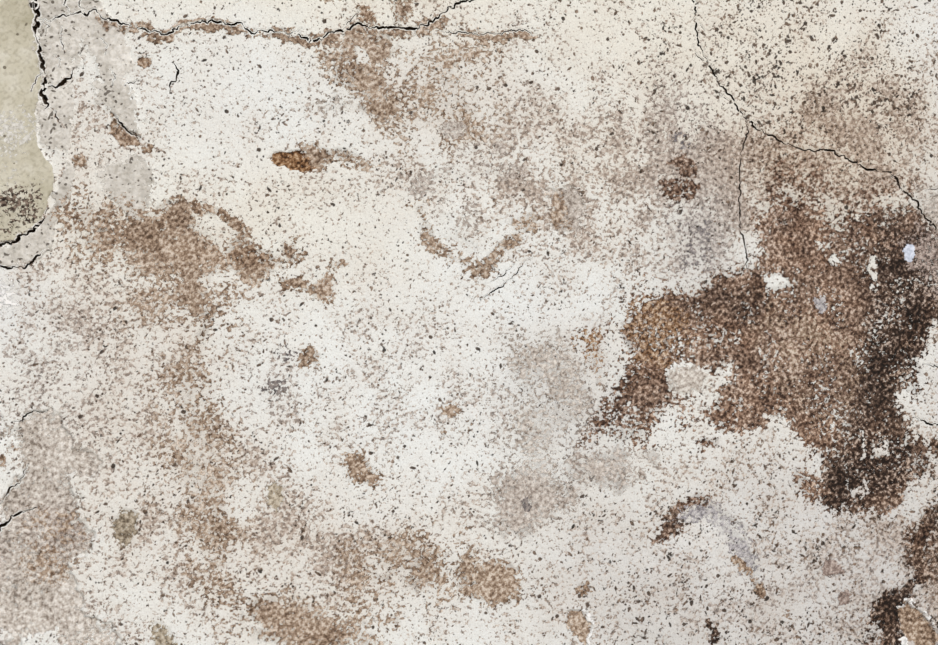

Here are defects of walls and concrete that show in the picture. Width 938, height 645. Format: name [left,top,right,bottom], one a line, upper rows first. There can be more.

crack [42,0,540,93]
crack [50,107,65,128]
crack [113,116,141,139]
crack [691,0,938,271]
spalling [0,183,43,242]
leakage [912,180,938,229]
spalling [0,412,19,467]
crack [0,410,47,422]
leakage [46,183,661,645]
crack [0,464,36,533]